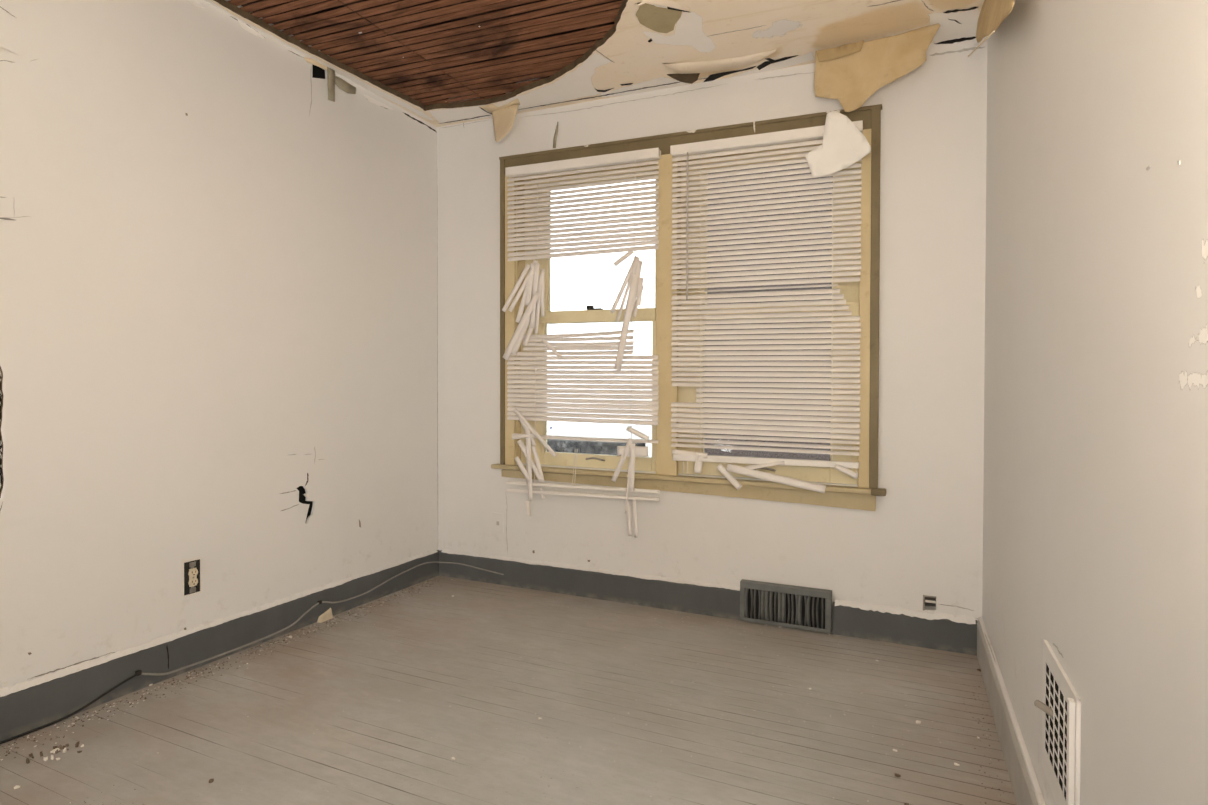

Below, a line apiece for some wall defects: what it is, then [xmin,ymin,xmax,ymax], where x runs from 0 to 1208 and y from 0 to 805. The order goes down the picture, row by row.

peeling [643,12,716,53]
peeling [929,8,980,42]
peeling [188,0,689,123]
peeling [729,52,814,78]
crack [0,197,29,220]
crack [0,375,8,511]
peeling [0,549,740,697]